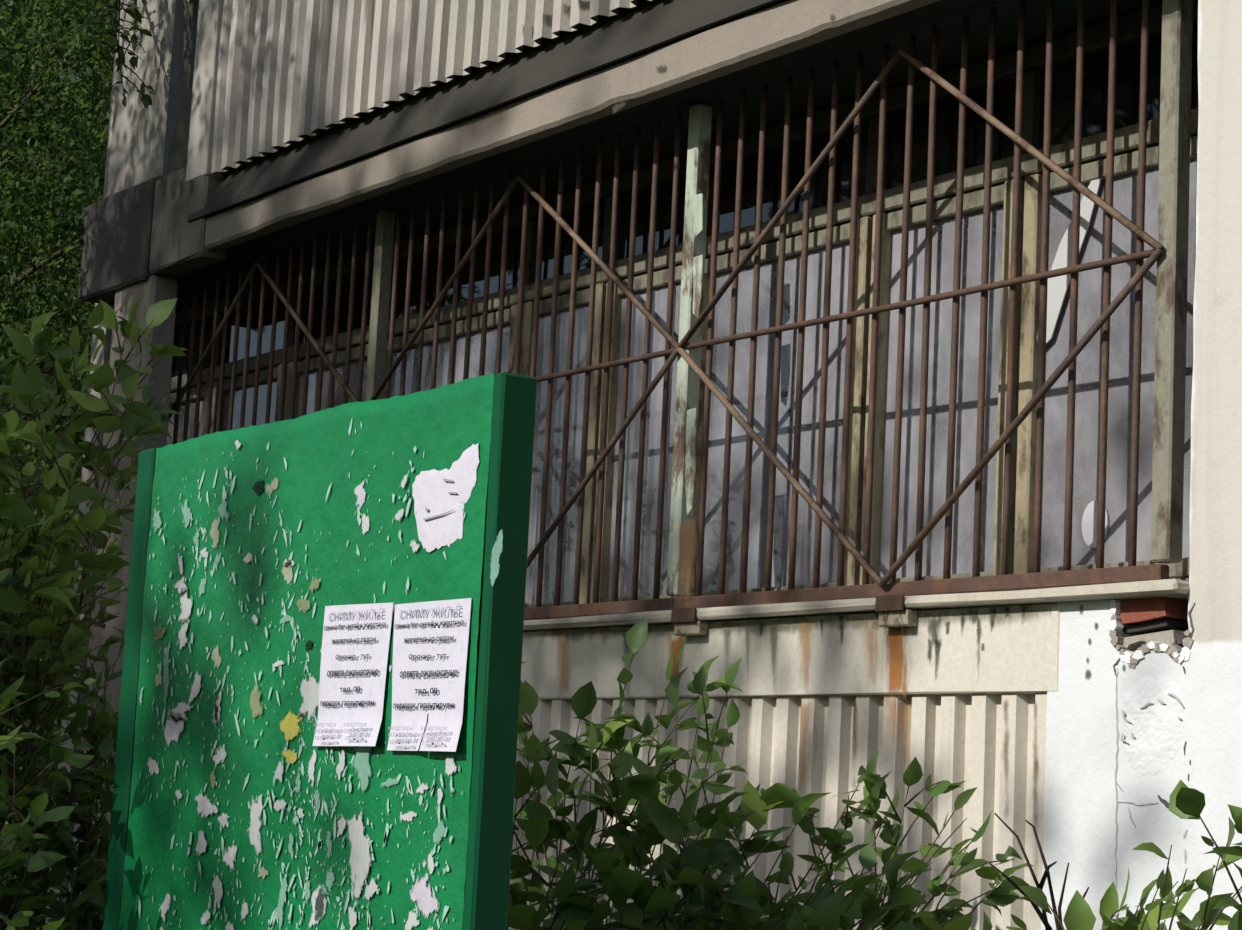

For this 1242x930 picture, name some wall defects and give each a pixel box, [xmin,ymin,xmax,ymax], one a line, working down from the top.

peeling [690,193,703,238]
peeling [693,254,704,318]
peeling [685,408,697,516]
corrosion [679,520,695,598]
water stain [553,626,632,653]
water stain [648,624,675,634]
water stain [712,615,879,659]
corrosion [801,625,809,673]
corrosion [869,628,909,732]
water stain [917,606,1038,673]
spalling [1106,597,1195,676]
crack [1115,668,1191,897]